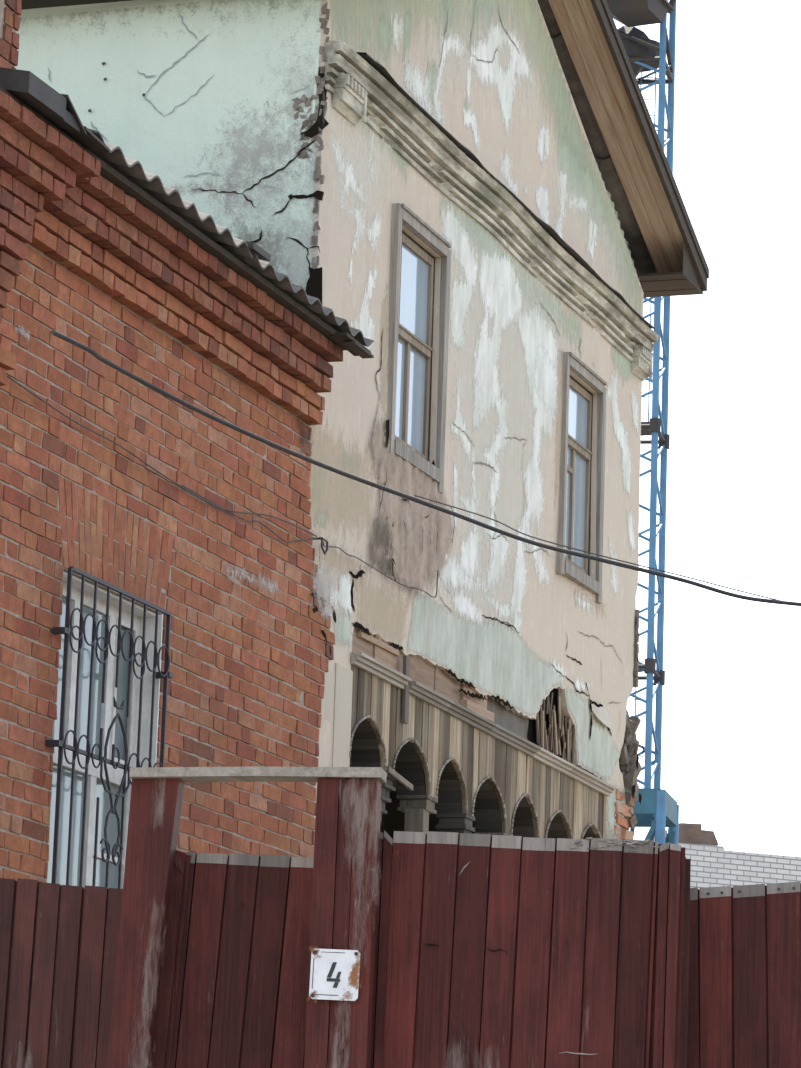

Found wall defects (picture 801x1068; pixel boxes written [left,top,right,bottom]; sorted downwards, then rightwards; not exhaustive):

crack [137,14,214,116]
peeling [391,14,532,149]
crack [438,5,520,79]
peeling [537,124,550,167]
crack [183,139,324,267]
peeling [501,152,597,260]
crack [370,333,383,456]
crack [452,422,528,515]
peeling [308,207,644,840]
crack [489,500,550,556]